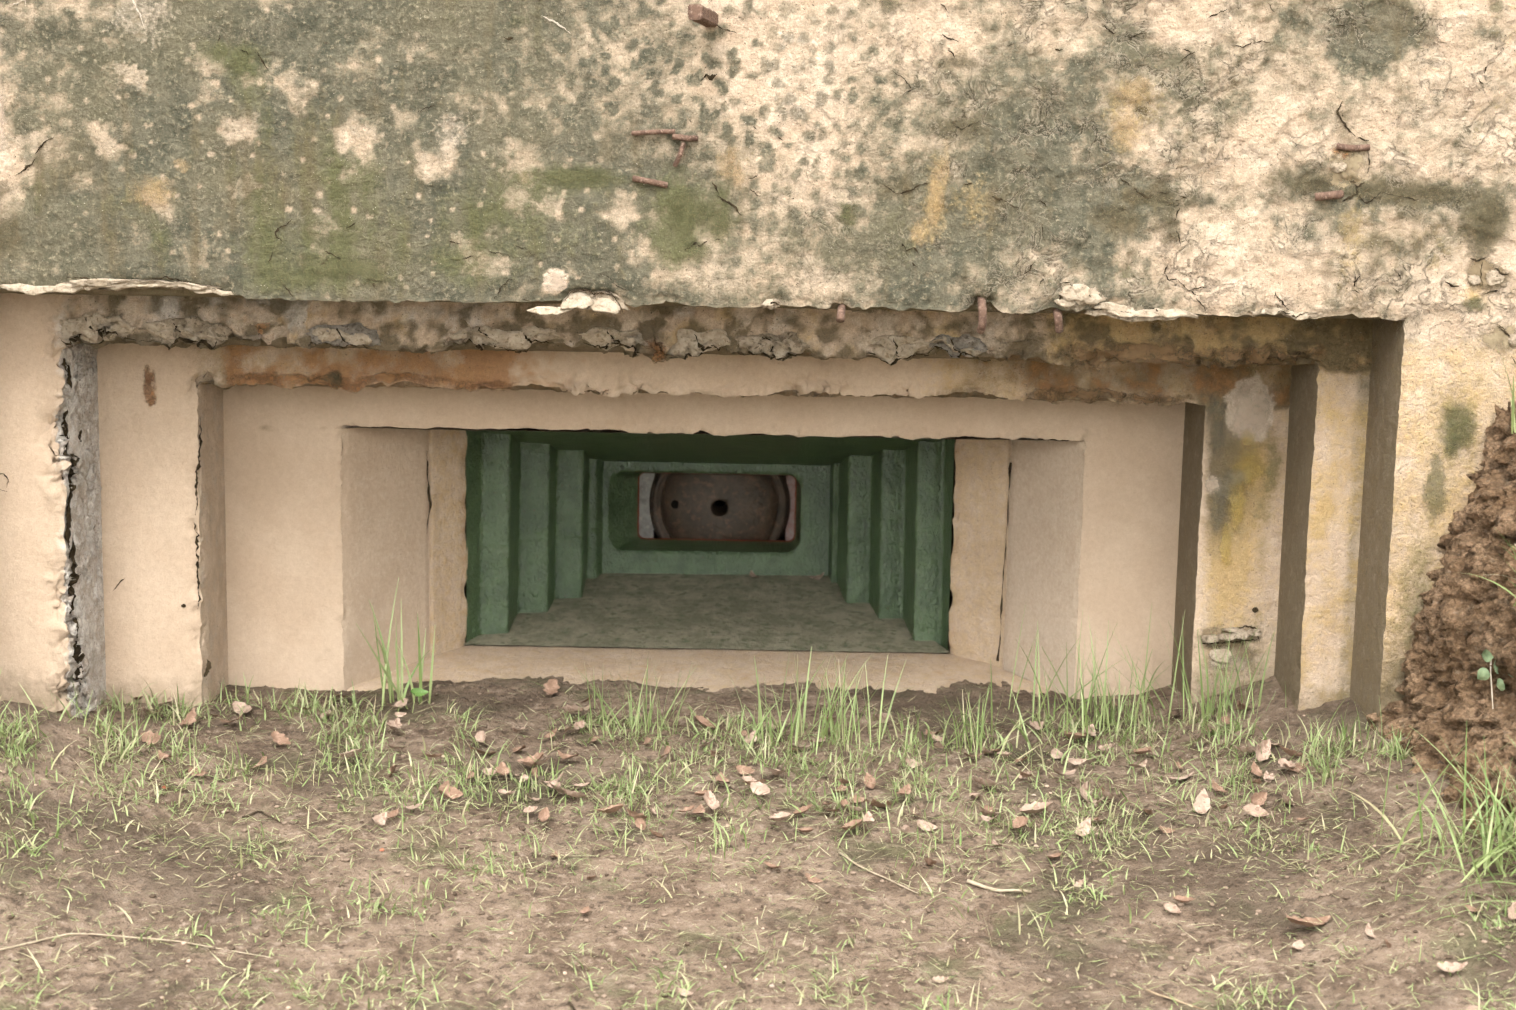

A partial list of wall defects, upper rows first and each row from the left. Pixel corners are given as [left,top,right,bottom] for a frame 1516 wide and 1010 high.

rust [688,4,718,27]
rust [631,129,698,188]
rust [1333,143,1370,158]
crack [1336,102,1418,204]
rust [1315,190,1344,201]
crack [1351,266,1407,294]
spalling [448,289,810,361]
rust [836,304,846,323]
rust [977,296,987,334]
spalling [866,334,991,366]
rust [234,372,512,392]
spalling [59,405,85,686]